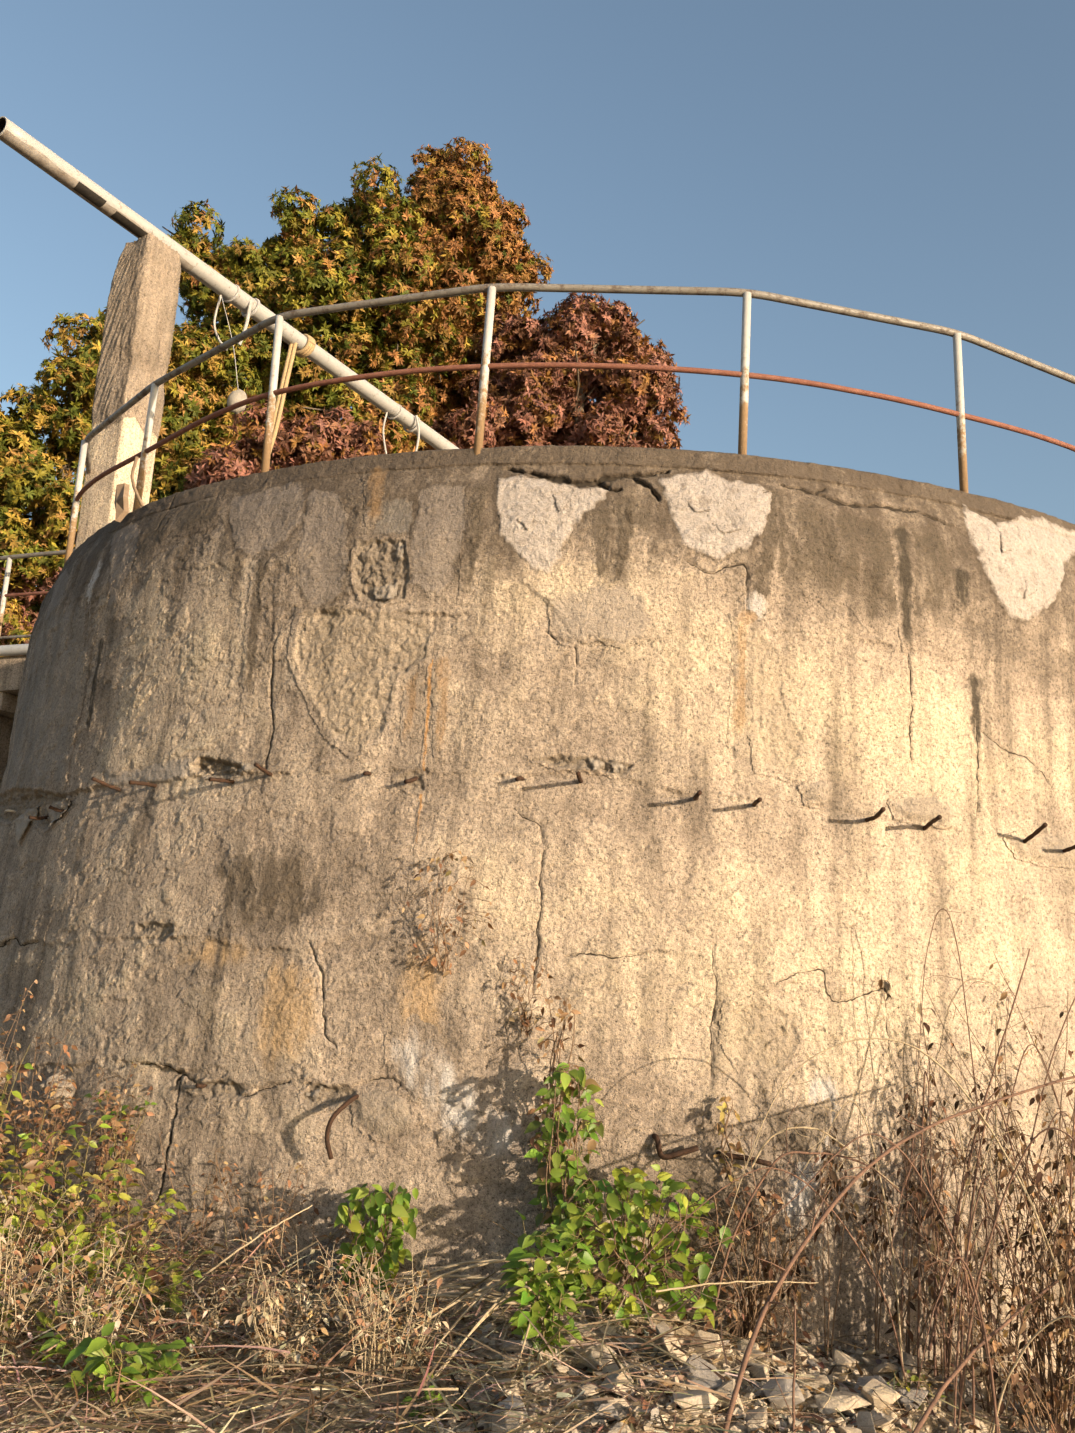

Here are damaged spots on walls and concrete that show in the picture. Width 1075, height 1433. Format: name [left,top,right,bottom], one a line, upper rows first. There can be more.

peeling [496,475,612,575]
peeling [657,467,773,560]
peeling [962,504,1075,621]
corrosion [400,636,454,866]
leakage [963,668,986,751]
crack [976,727,1055,809]
leakage [205,833,334,946]
crack [311,947,336,1046]
crack [766,968,891,1069]
crack [145,1063,290,1215]